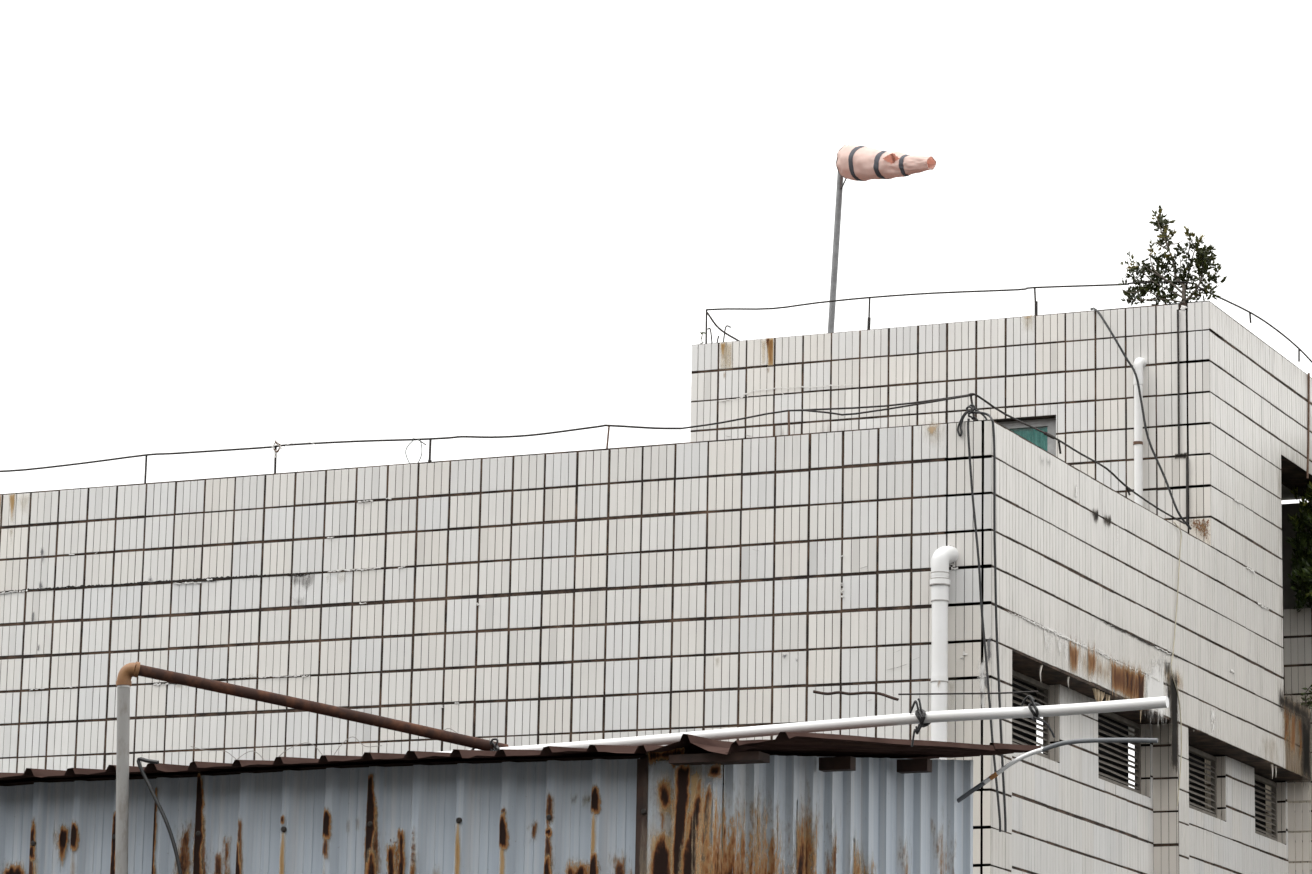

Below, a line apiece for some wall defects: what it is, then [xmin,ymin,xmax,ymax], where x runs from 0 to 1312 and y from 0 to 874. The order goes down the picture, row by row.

corrosion [763,338,773,370]
corrosion [1070,636,1145,699]
corrosion [2,820,36,874]
corrosion [57,822,80,865]
corrosion [175,773,243,874]
corrosion [364,774,415,874]
corrosion [532,747,837,874]
corrosion [853,844,874,874]